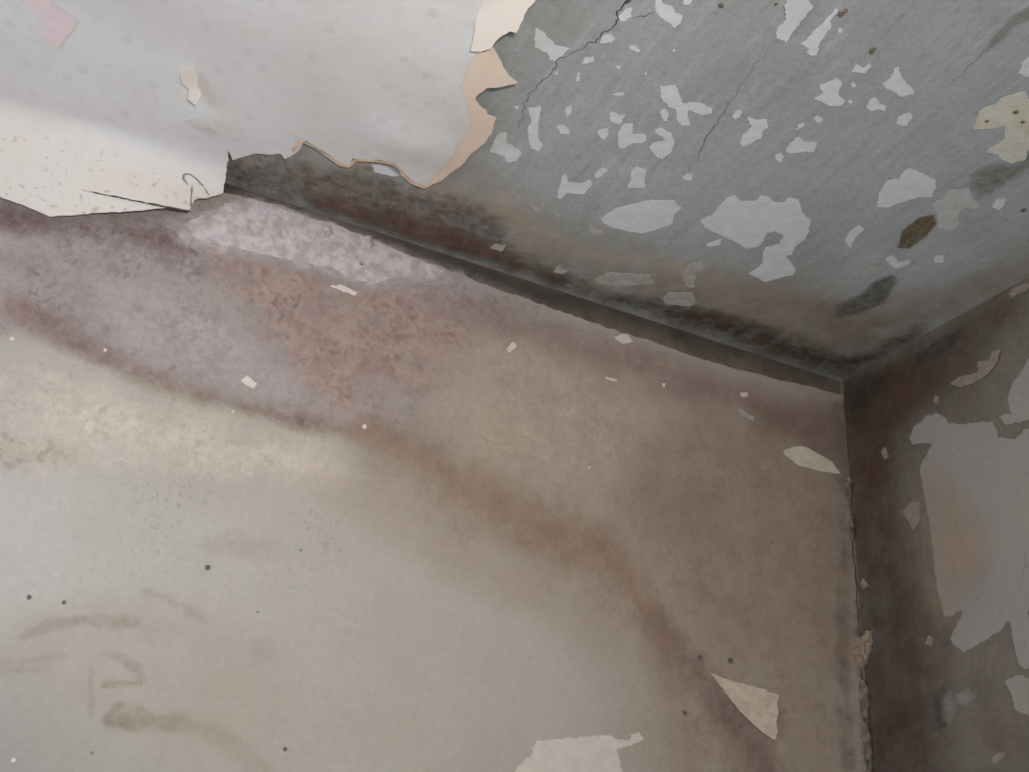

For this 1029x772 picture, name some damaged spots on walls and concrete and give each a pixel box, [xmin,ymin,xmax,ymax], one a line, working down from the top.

peeling [534,28,570,74]
peeling [655,0,693,28]
peeling [776,0,843,56]
peeling [815,63,871,106]
peeling [490,106,543,162]
peeling [597,85,712,159]
peeling [974,91,1029,164]
peeling [587,166,681,236]
peeling [876,168,1007,232]
peeling [700,195,811,282]
peeling [902,359,1029,715]
crack [844,398,874,772]